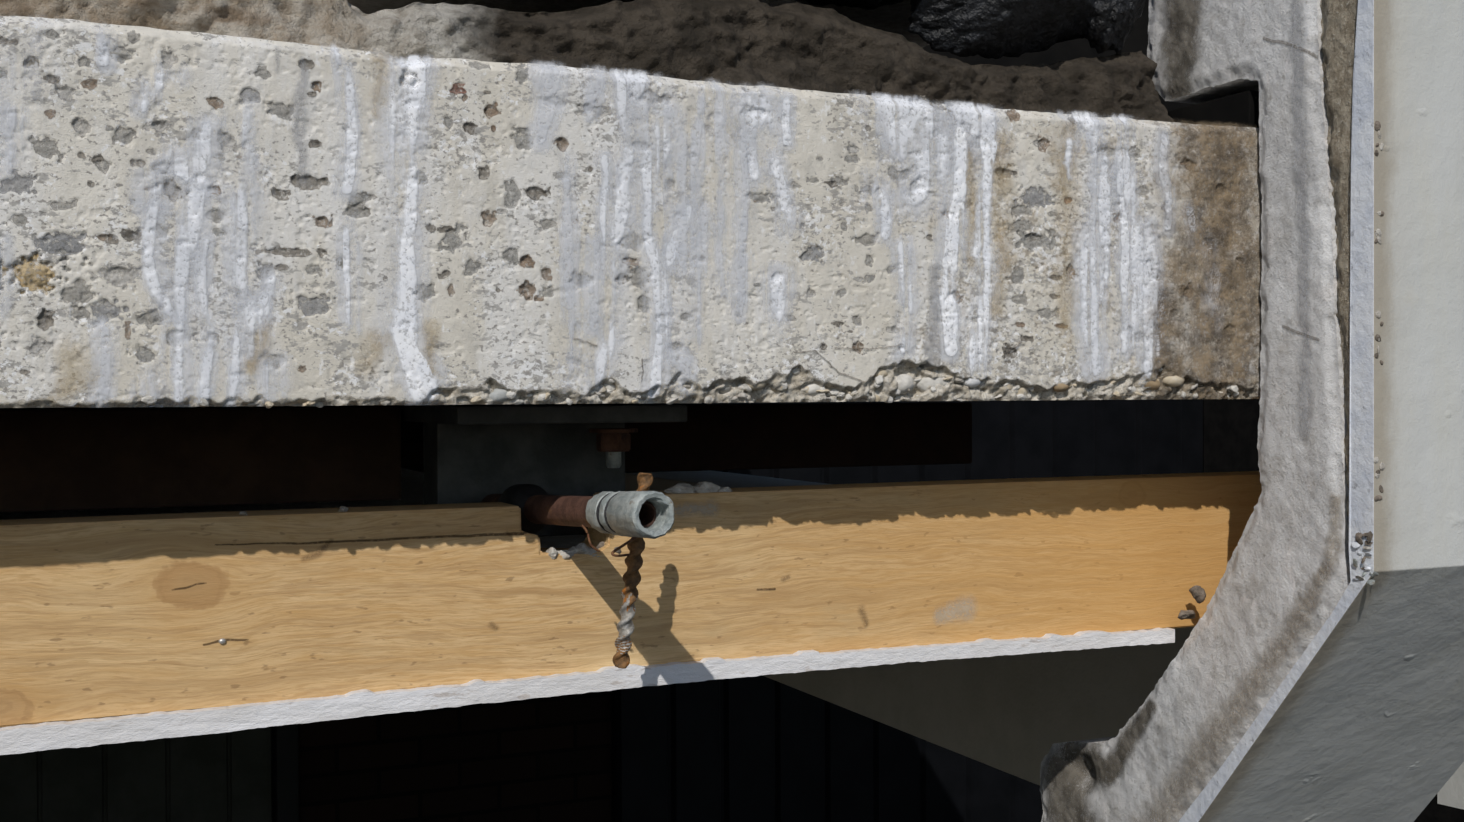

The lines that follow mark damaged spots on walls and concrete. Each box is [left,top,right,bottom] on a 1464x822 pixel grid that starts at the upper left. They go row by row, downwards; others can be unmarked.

damp [88,319,112,408]
damp [131,110,287,407]
damp [332,46,360,200]
damp [337,225,361,331]
damp [377,55,445,405]
damp [529,63,569,151]
spalling [0,321,1255,408]
damp [559,70,800,404]
damp [864,94,1000,373]
damp [1059,112,1222,383]